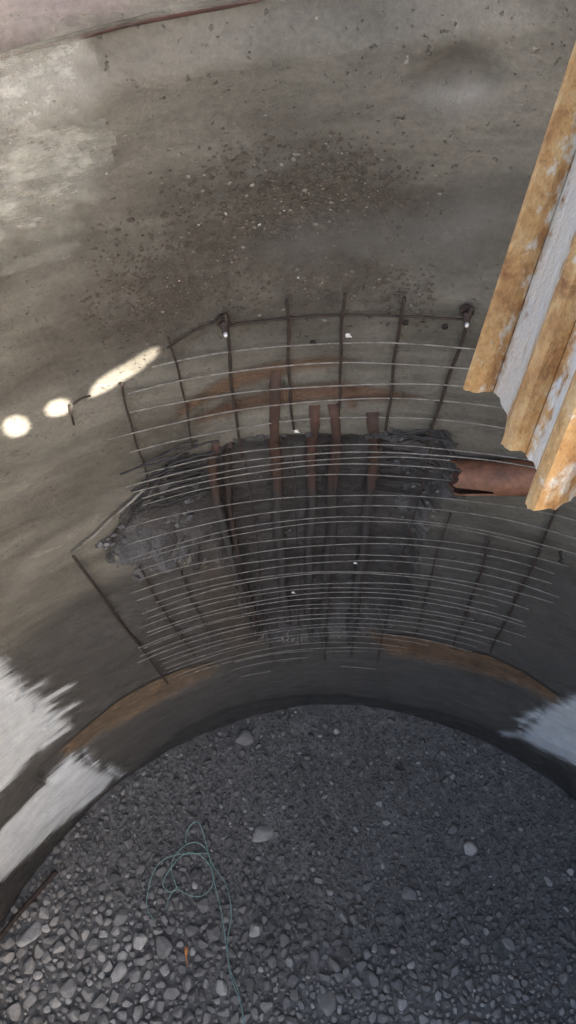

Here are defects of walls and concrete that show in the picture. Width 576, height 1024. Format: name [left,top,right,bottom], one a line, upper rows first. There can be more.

spalling [95,427,466,644]
corrosion [181,359,410,645]